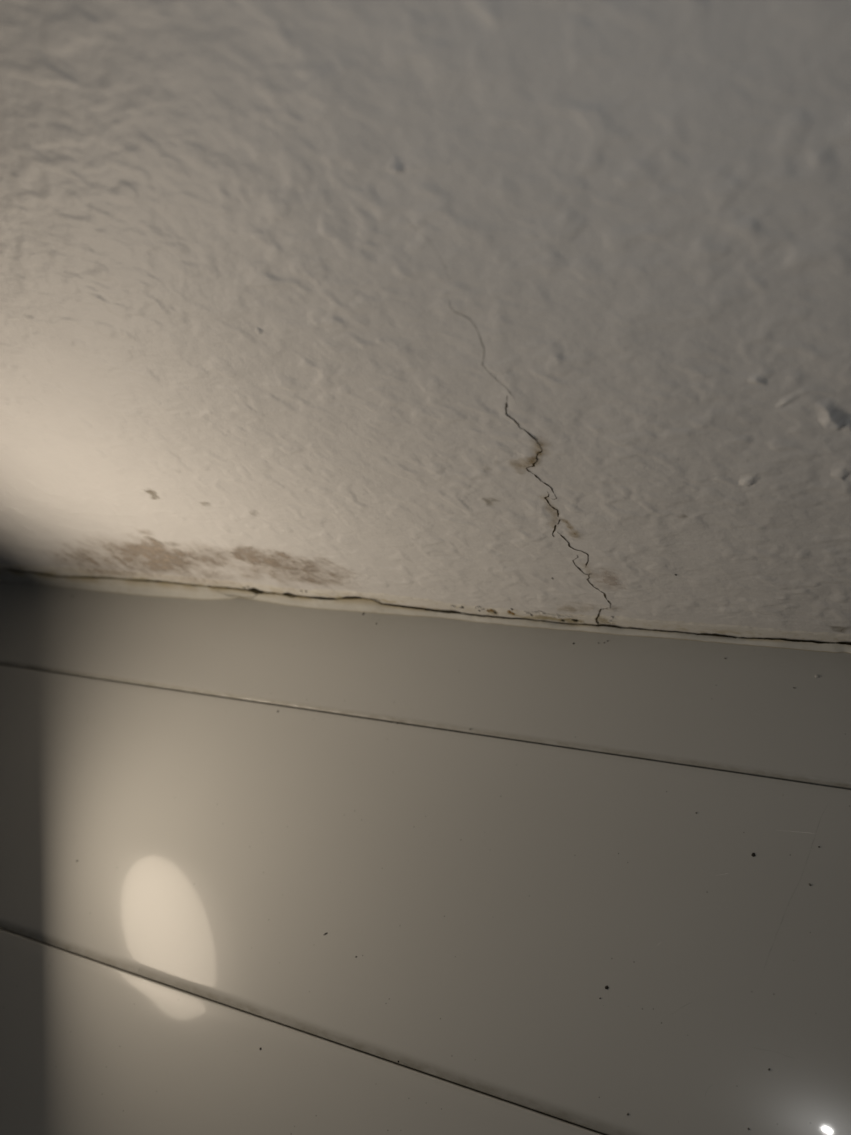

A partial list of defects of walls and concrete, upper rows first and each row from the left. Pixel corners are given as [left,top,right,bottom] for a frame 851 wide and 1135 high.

crack [2,312,851,645]
water stain [115,539,184,571]
water stain [233,548,314,594]